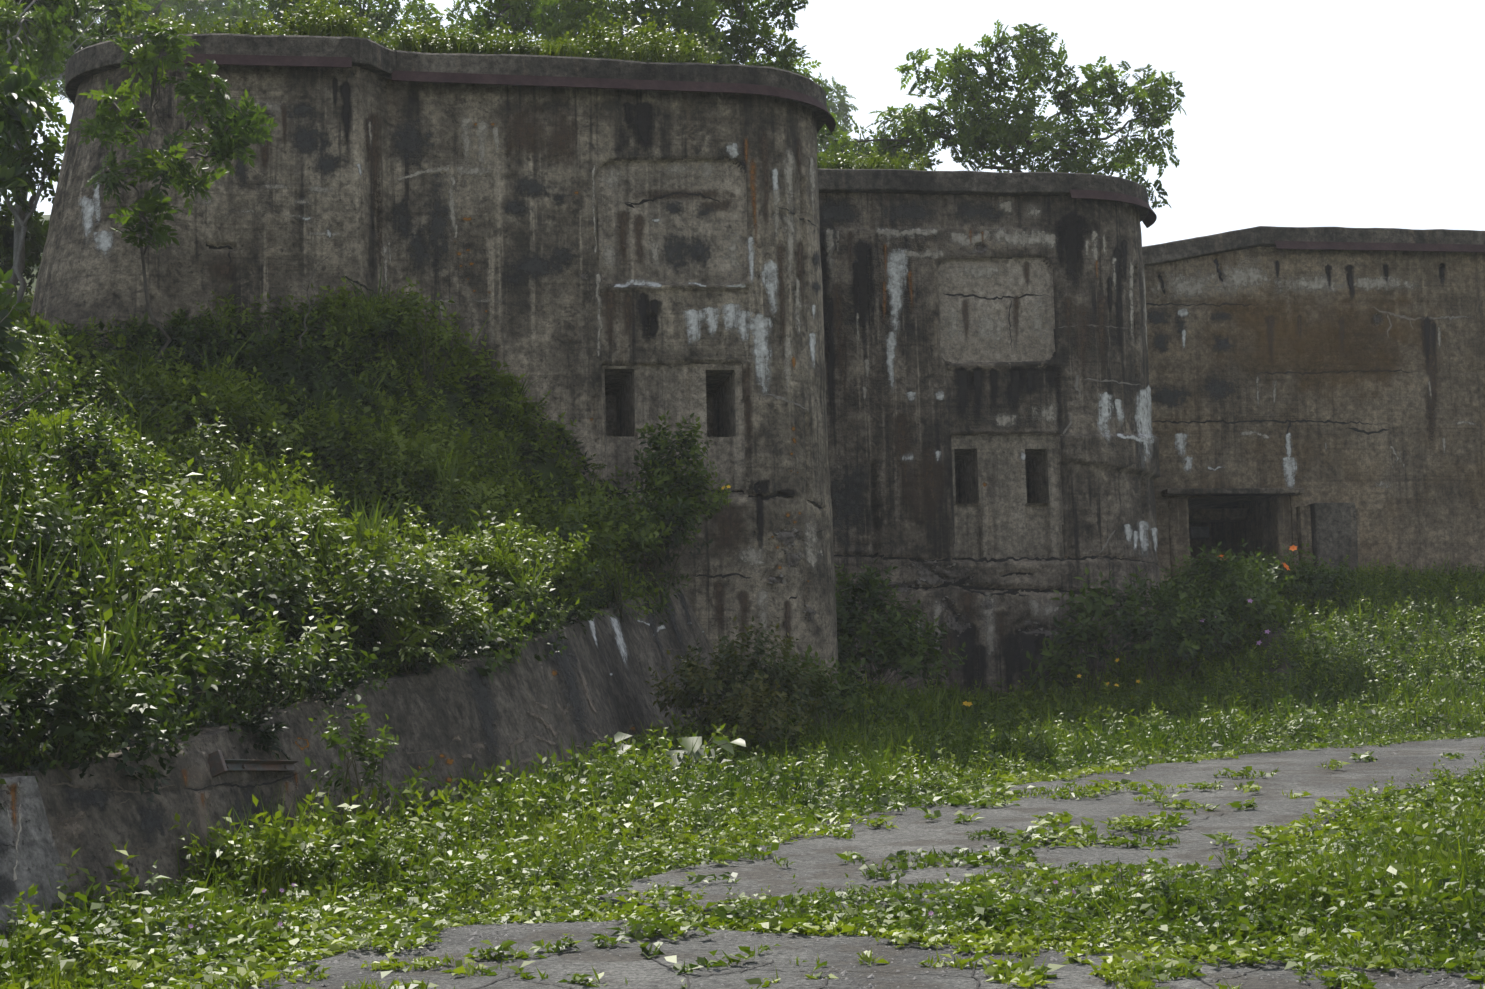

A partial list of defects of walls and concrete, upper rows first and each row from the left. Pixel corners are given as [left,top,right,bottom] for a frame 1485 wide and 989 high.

leakage [623,102,658,152]
leakage [504,176,565,216]
leakage [760,132,778,225]
leakage [603,190,732,342]
leakage [685,198,1127,449]
leakage [1147,309,1188,354]
leakage [1099,374,1235,459]
crack [711,481,1156,622]
leakage [1124,521,1157,552]
leakage [589,617,627,675]